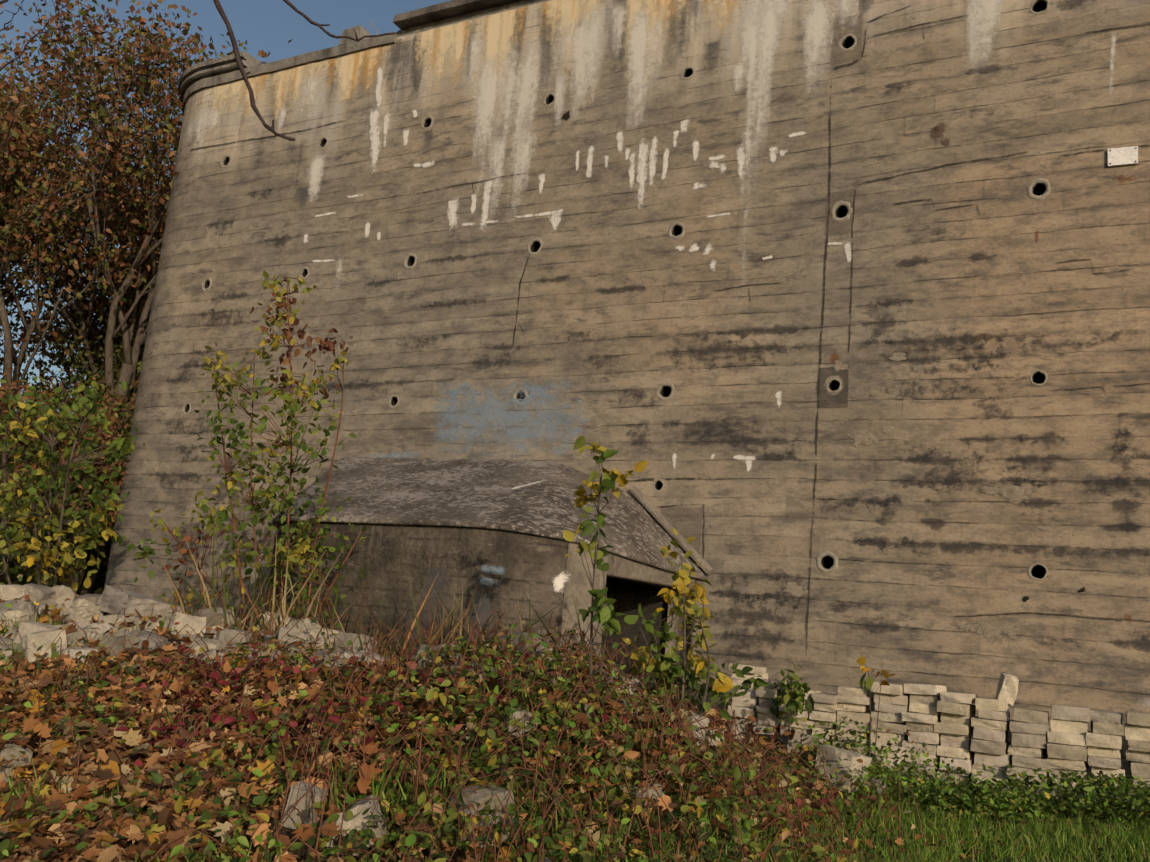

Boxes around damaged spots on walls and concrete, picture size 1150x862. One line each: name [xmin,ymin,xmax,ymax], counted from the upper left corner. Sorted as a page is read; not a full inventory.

rust [212,45,388,118]
damp [369,36,422,171]
rust [416,7,527,98]
damp [447,0,685,230]
rust [542,0,600,78]
rust [626,0,686,81]
damp [576,0,787,209]
damp [298,156,324,201]
crack [513,257,529,344]
crack [806,6,1030,649]
damp [1084,431,1150,531]
damp [856,518,1149,556]